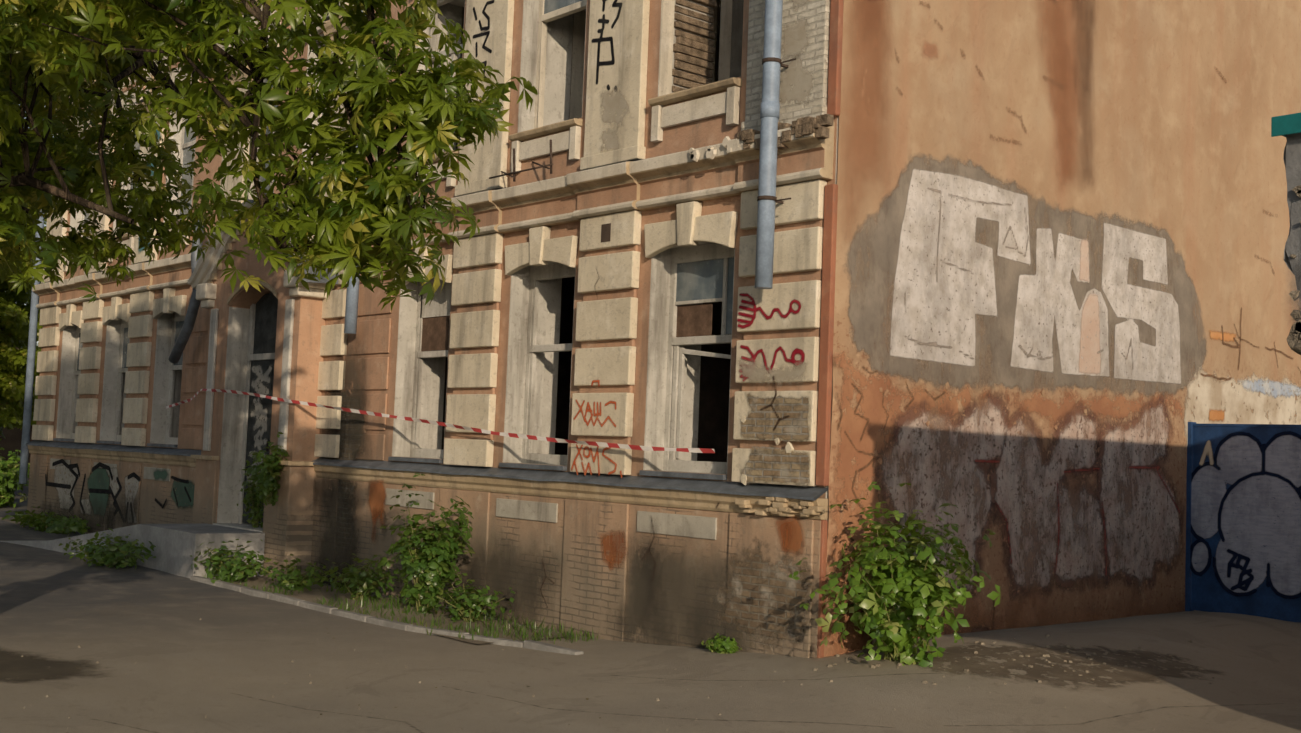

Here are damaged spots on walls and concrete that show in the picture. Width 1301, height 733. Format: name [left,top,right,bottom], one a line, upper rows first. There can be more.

peeling [777,0,834,150]
damp [1044,0,1077,172]
flaking render [689,129,760,162]
spalling [1286,254,1301,345]
damp [324,350,365,460]
crack [760,376,790,430]
peeling [1007,367,1301,443]
peeling [735,353,990,588]
damp [456,550,549,620]
rust [602,532,626,568]
damp [622,543,740,646]
rust [777,518,803,553]